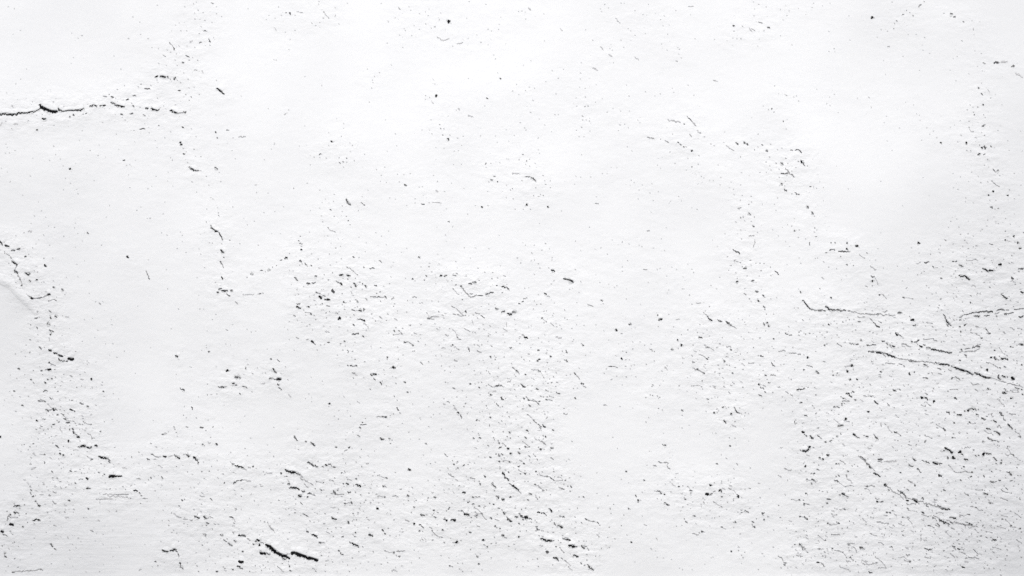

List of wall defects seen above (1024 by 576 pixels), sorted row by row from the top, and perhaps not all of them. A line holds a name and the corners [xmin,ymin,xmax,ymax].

crack [0,71,186,133]
crack [800,260,1024,527]
crack [173,513,324,572]